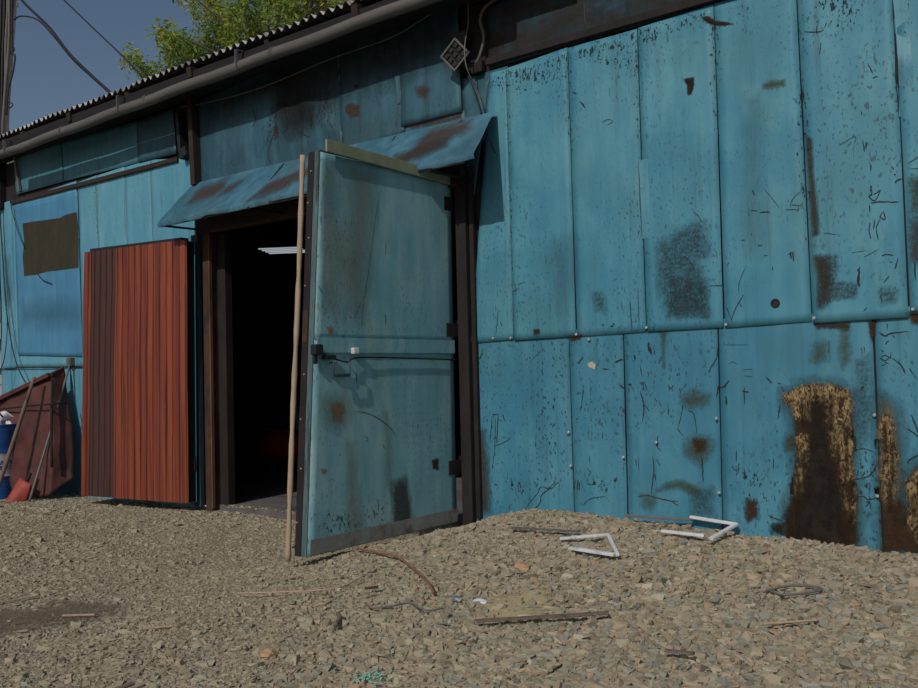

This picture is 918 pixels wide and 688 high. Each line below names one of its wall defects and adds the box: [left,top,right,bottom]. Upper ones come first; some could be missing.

rust [688,439,709,460]
rust [745,498,758,522]
rust [771,383,858,546]
rust [878,407,918,553]